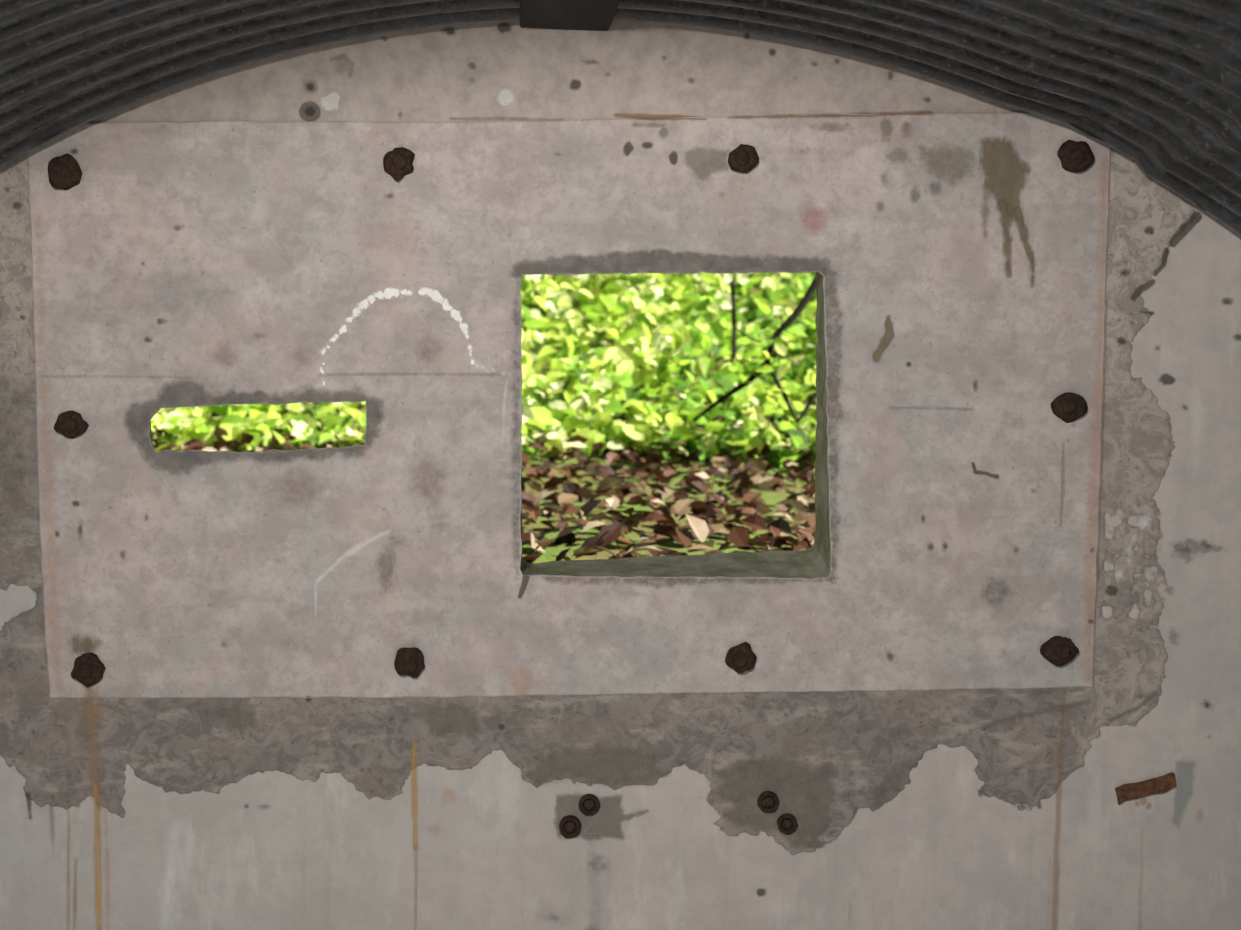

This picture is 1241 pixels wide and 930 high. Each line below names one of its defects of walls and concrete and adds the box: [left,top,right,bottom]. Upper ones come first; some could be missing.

peeling [0,147,1194,855]
leakage [929,139,1034,284]